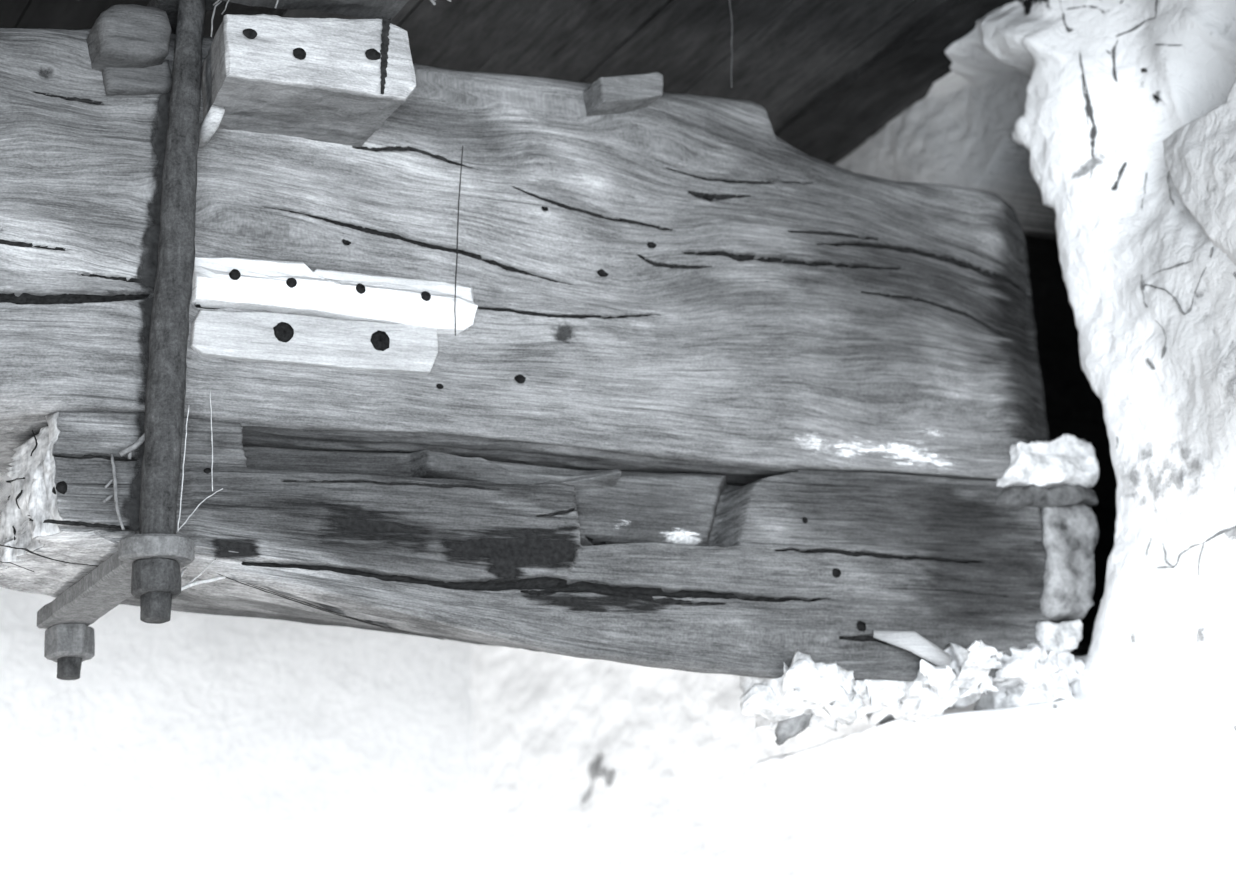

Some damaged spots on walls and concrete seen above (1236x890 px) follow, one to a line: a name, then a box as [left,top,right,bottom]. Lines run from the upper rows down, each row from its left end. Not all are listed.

crack [33,91,104,105]
crack [667,168,814,200]
crack [0,239,150,305]
crack [264,207,567,284]
crack [512,186,1026,336]
crack [477,307,661,319]
crack [536,508,575,517]
damp [319,504,664,613]
crack [586,537,606,545]
crack [775,549,979,563]
crack [219,562,829,640]